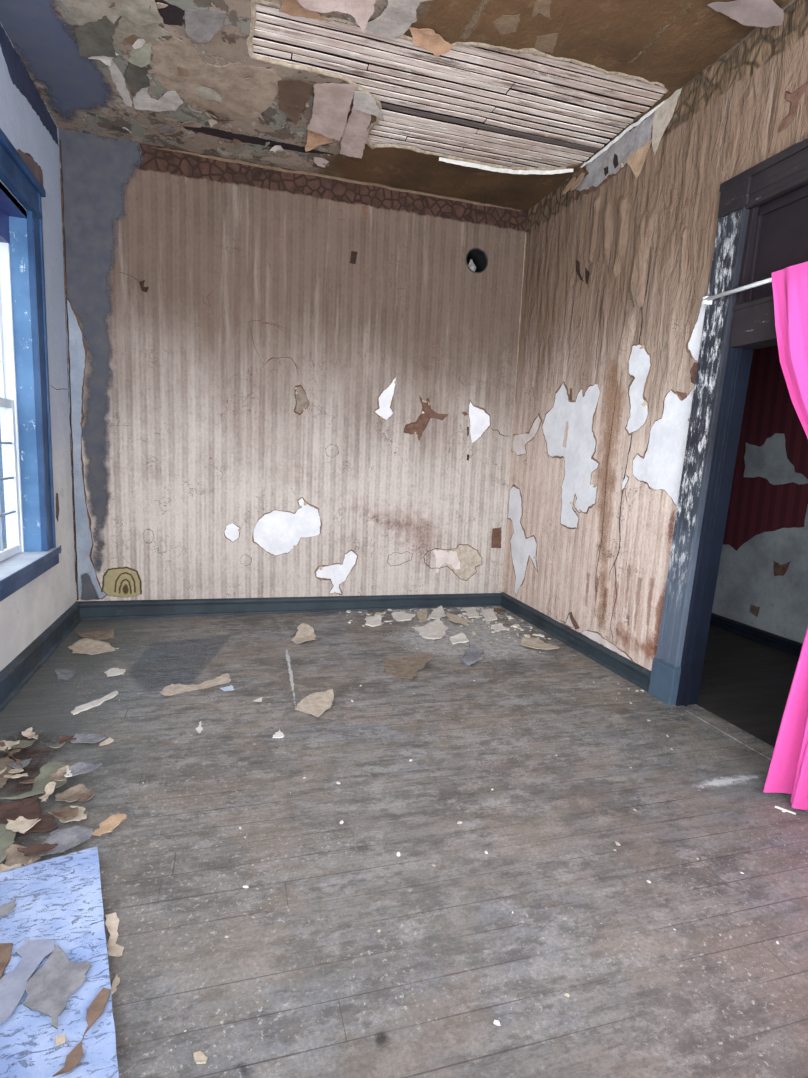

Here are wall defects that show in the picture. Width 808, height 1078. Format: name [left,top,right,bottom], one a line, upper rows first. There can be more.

peeling [61,0,682,196]
peeling [59,155,107,600]
peeling [374,378,396,421]
peeling [468,399,491,443]
peeling [510,382,600,529]
peeling [621,343,694,506]
peeling [224,497,322,556]
peeling [315,549,358,595]
peeling [424,544,482,581]
peeling [507,484,538,595]